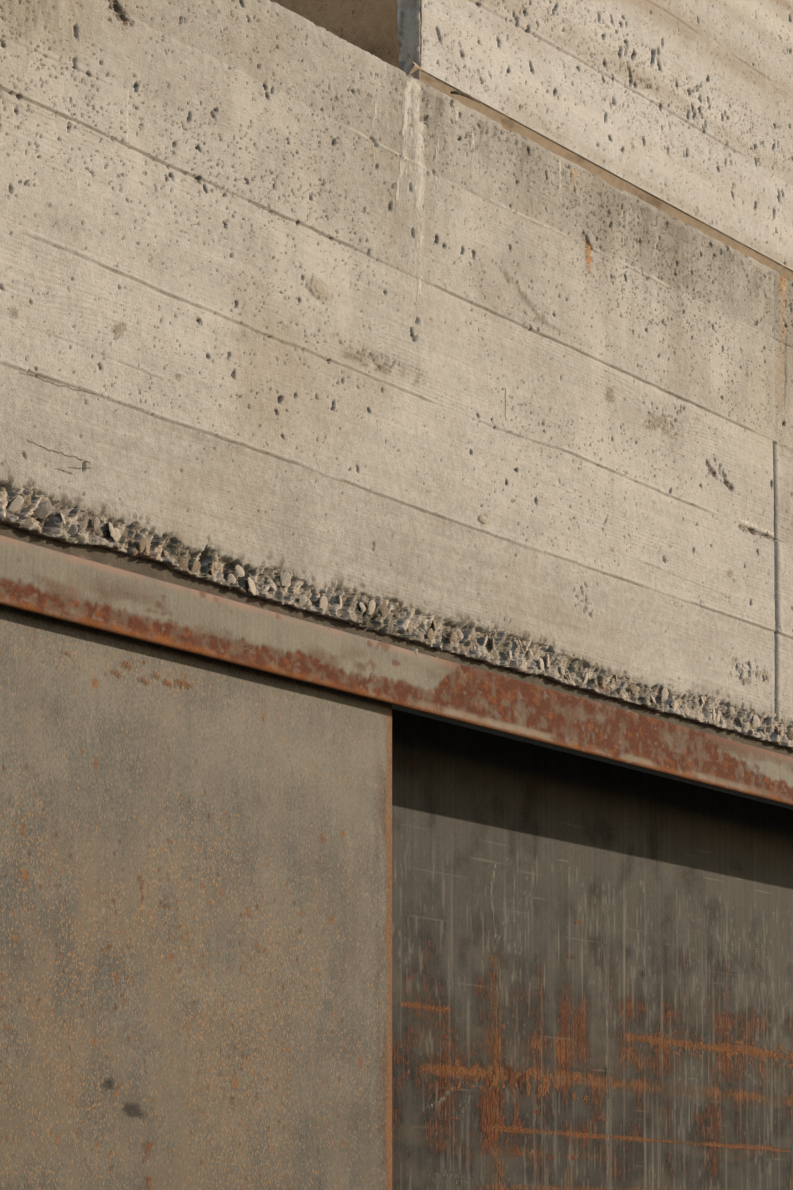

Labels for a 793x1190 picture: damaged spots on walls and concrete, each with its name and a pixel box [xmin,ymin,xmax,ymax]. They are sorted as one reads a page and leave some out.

spalling [0,485,793,750]
rust [420,956,793,1190]